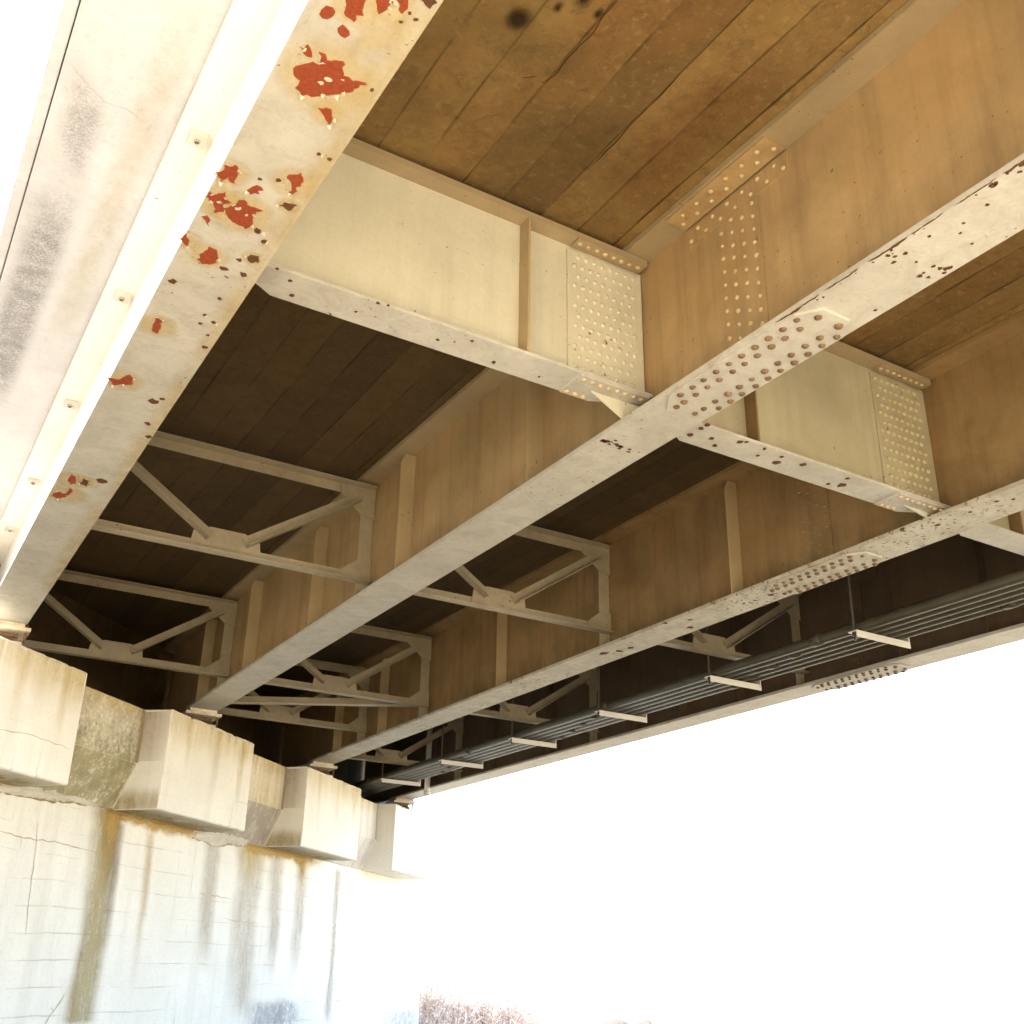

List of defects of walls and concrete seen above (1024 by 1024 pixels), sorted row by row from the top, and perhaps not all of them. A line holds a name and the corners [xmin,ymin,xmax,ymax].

crack [524,4,615,82]
peeling [293,44,368,130]
peeling [202,164,263,229]
peeling [276,173,304,211]
corrosion [954,160,1024,206]
peeling [180,233,221,265]
corrosion [869,213,953,279]
corrosion [777,269,858,322]
peeling [107,375,134,388]
peeling [51,474,89,501]
damp [0,690,333,1024]